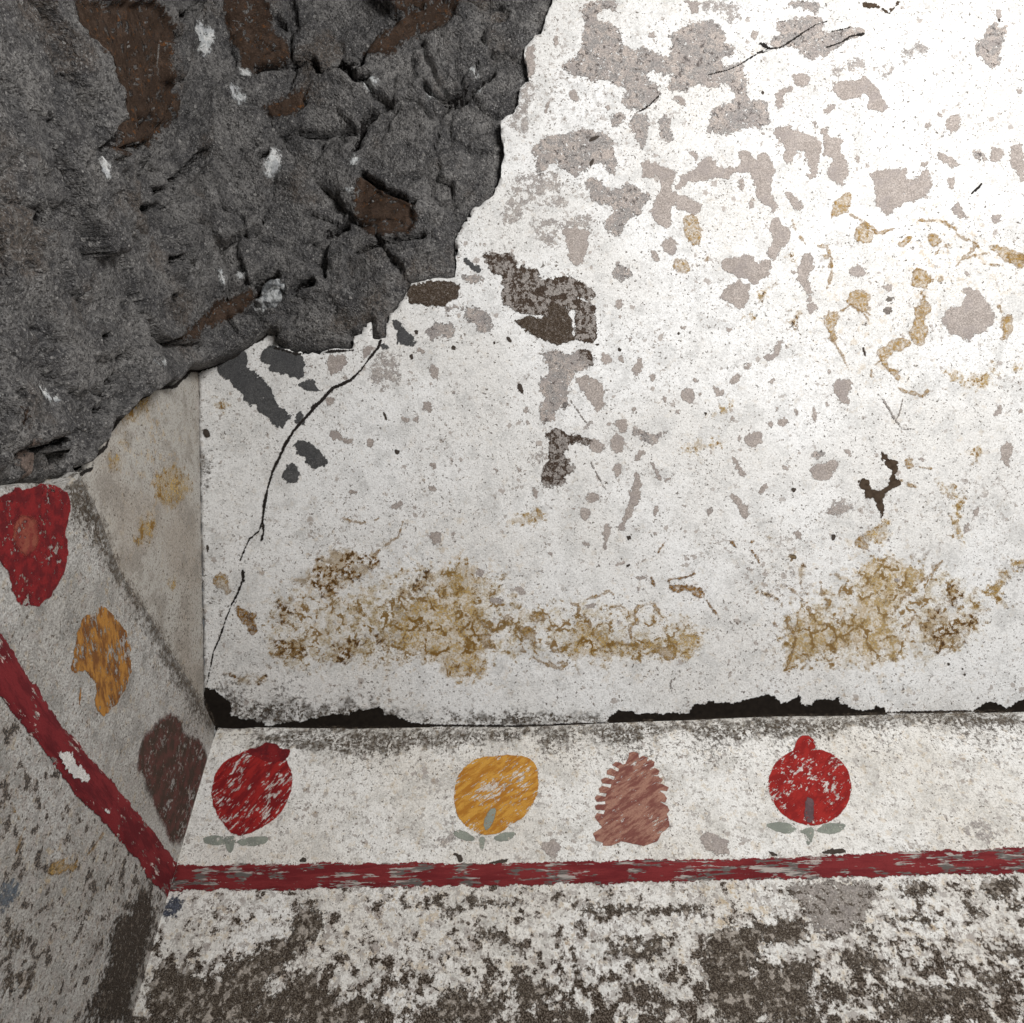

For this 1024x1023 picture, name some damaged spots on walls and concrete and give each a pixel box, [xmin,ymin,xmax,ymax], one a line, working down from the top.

crack [708,21,865,75]
peeling [975,9,1008,71]
peeling [869,150,961,216]
spalling [0,0,933,550]
peeling [941,271,995,342]
crack [80,335,382,682]
leakage [341,565,450,670]
leakage [474,572,706,665]
leakage [777,565,988,670]
spalling [204,687,431,731]
spalling [608,694,888,723]
spalling [974,699,1024,713]